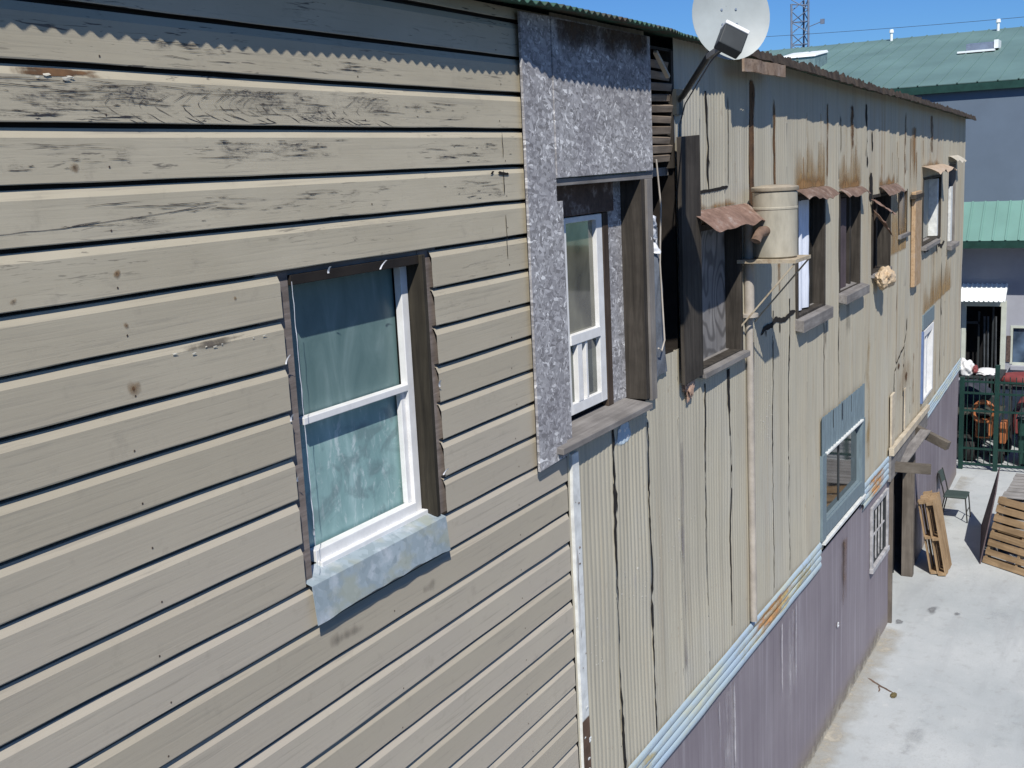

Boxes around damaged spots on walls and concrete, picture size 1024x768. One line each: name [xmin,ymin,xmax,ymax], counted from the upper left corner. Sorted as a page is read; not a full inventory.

peeling [0,67,460,126]
rust [797,142,828,189]
rust [840,106,860,189]
crack [704,368,732,606]
crack [612,429,627,768]
rust [758,594,781,630]